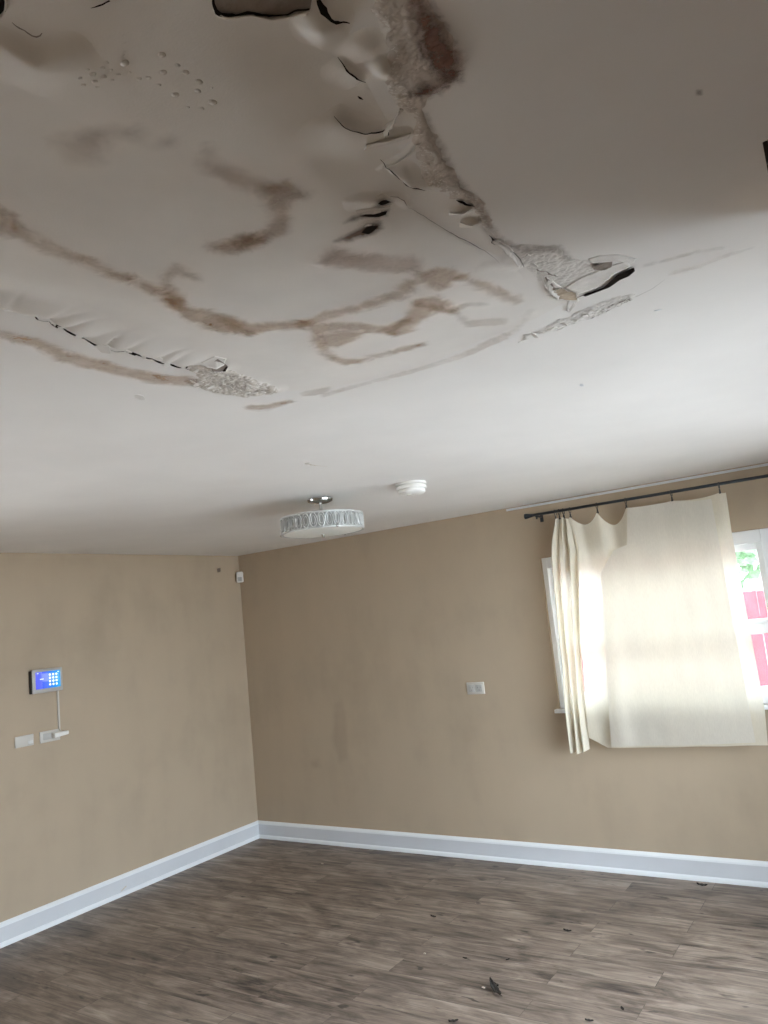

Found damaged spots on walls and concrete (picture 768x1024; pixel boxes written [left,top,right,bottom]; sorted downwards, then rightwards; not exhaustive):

damp [343,215,381,240]
peeling [520,294,636,342]
peeling [184,365,279,398]